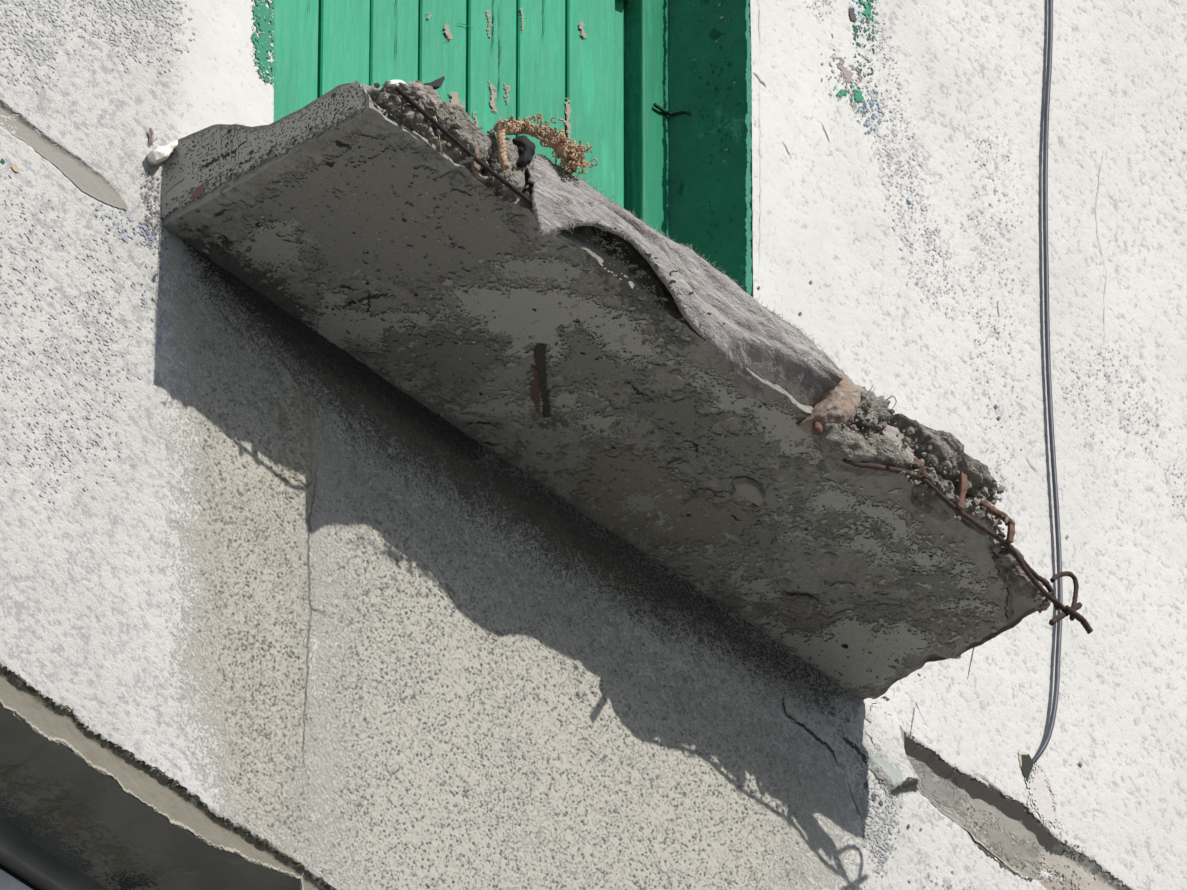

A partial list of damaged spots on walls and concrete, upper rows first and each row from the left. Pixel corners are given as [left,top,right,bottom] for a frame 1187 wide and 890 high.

corrosion [529,344,551,418]
corrosion [979,500,1015,525]
spalling [0,667,322,890]
crack [782,696,918,820]
spalling [864,725,1132,890]
crack [916,743,1130,889]